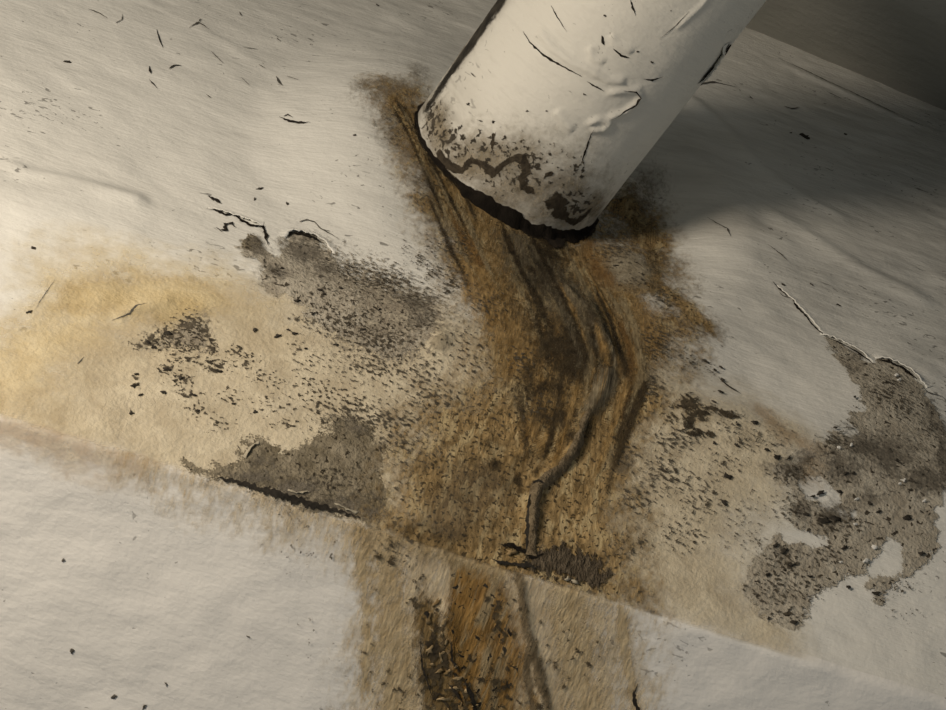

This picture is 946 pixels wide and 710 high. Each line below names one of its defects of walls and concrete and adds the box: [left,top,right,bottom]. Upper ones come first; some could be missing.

crack [207,195,269,251]
damp [0,263,502,536]
peeling [128,149,562,561]
corrosion [252,75,715,710]
crack [523,32,603,91]
crack [601,36,629,58]
crack [582,77,662,164]
damp [599,359,799,647]
peeling [492,222,946,631]
crack [774,283,827,336]